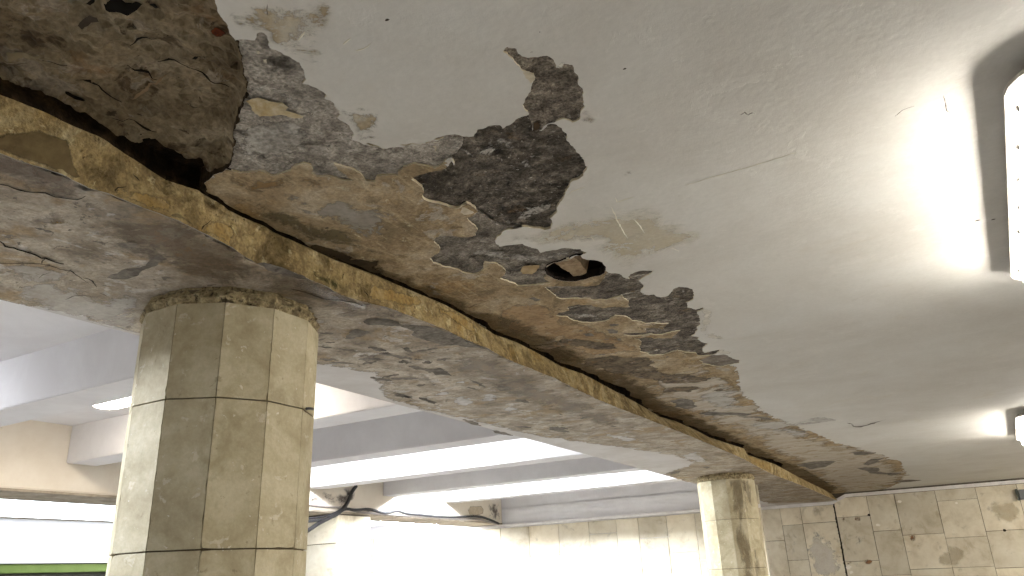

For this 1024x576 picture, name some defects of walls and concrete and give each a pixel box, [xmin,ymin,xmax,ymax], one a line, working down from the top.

crack [65,91,85,101]
crack [140,134,204,170]
crack [0,184,85,200]
spalling [0,0,776,421]
crack [0,241,107,300]
crack [290,288,369,306]
crack [468,304,487,329]
crack [616,386,653,412]
peeling [463,419,531,436]
peeling [797,461,836,469]
peeling [851,451,921,482]
crack [833,504,848,576]